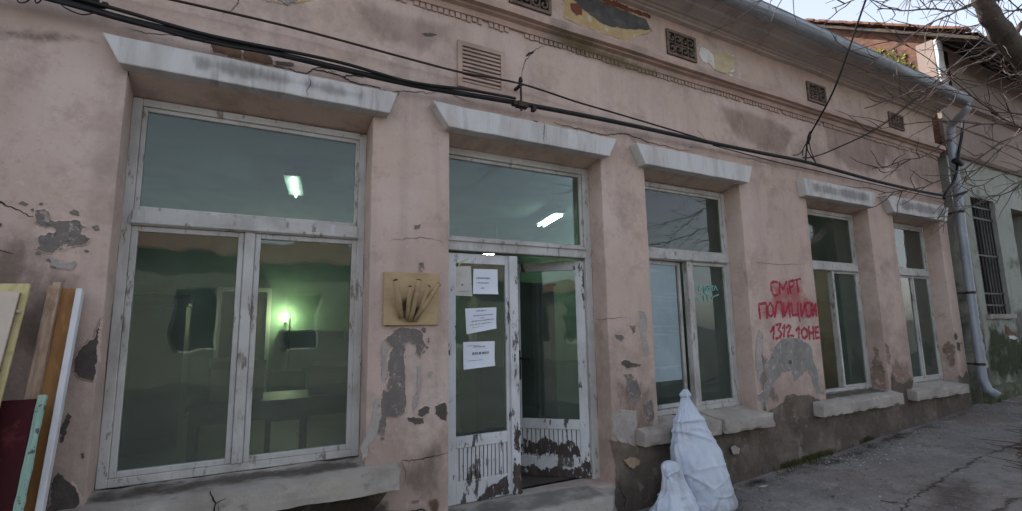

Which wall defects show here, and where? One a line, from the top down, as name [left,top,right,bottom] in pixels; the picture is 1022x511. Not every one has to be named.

peeling [562,0,652,42]
spalling [19,201,99,270]
spalling [72,317,103,383]
peeling [361,325,449,459]
spalling [620,359,655,424]
peeling [755,330,824,410]
spalling [45,473,83,511]